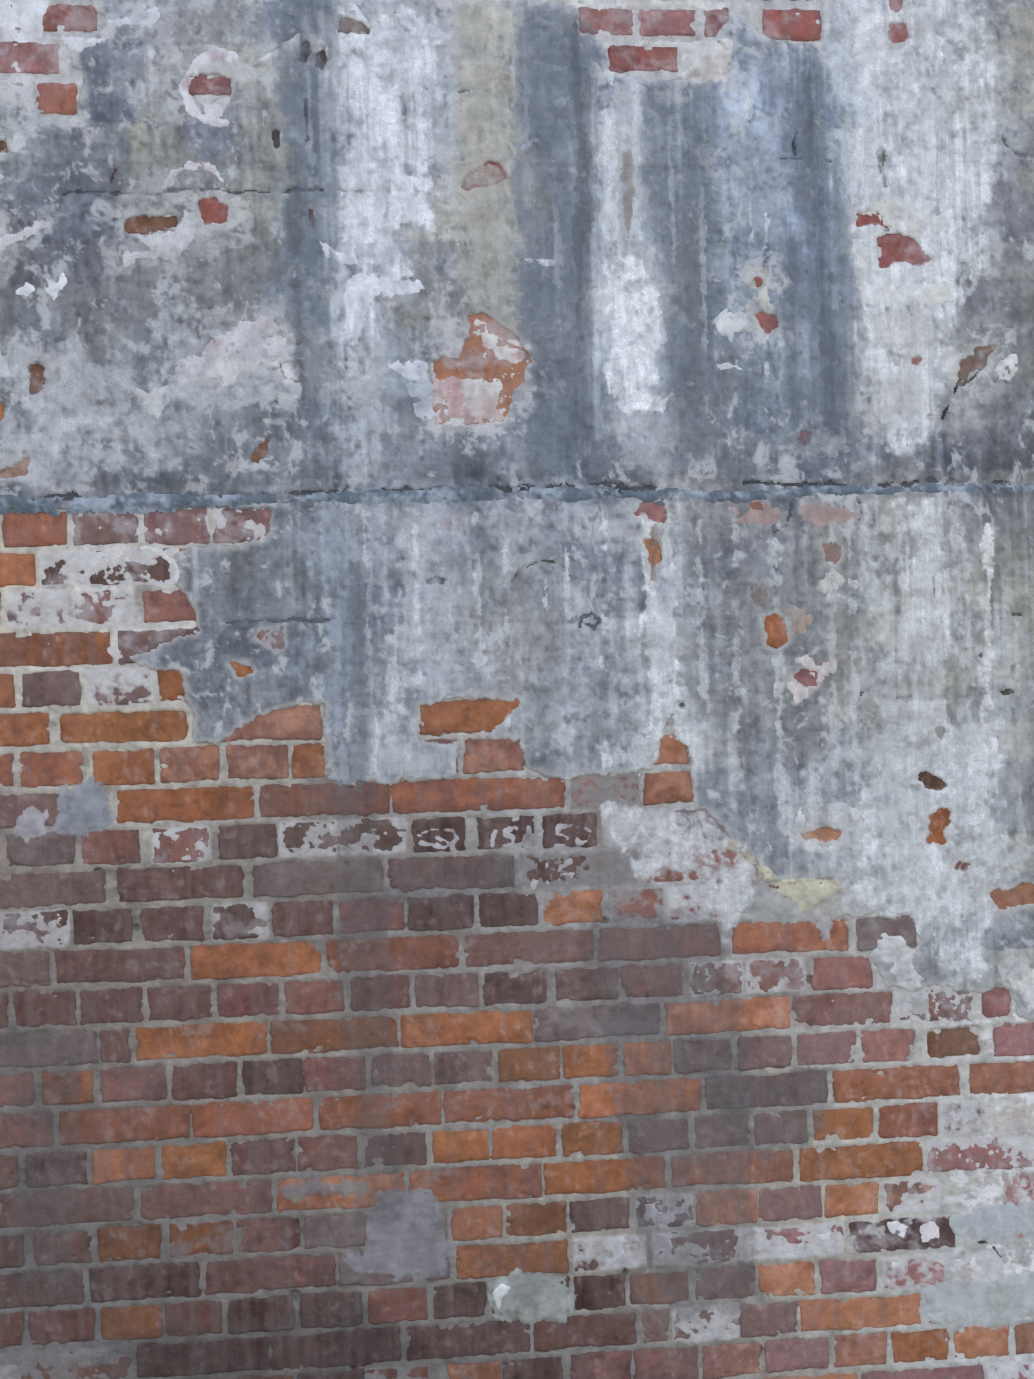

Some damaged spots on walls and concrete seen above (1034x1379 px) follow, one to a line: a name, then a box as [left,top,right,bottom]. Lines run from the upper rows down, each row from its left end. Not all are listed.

flaking render [0,0,160,121]
flaking render [525,0,823,84]
crack [1002,135,1027,158]
water stain [152,0,440,489]
water stain [457,3,669,470]
water stain [666,94,710,355]
flaking render [388,313,535,428]
water stain [328,510,487,785]
water stain [542,551,572,629]
spalling [60,710,188,743]
flaking render [918,771,952,845]
flaking render [871,933,980,1058]